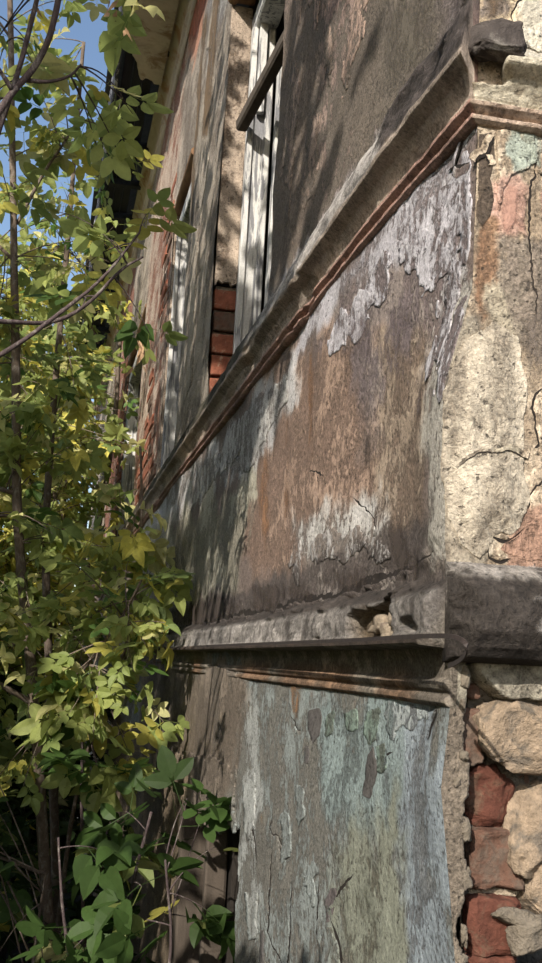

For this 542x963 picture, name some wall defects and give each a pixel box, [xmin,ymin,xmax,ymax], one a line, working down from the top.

peeling [295,0,369,98]
crack [499,0,526,21]
peeling [327,129,536,404]
crack [528,136,542,357]
crack [455,388,542,468]
crack [528,481,542,511]
water stain [165,595,242,625]
flaking render [367,613,393,636]
peeling [304,700,434,799]
flaking render [453,665,542,963]
peeling [244,891,276,963]
peeling [303,861,339,963]